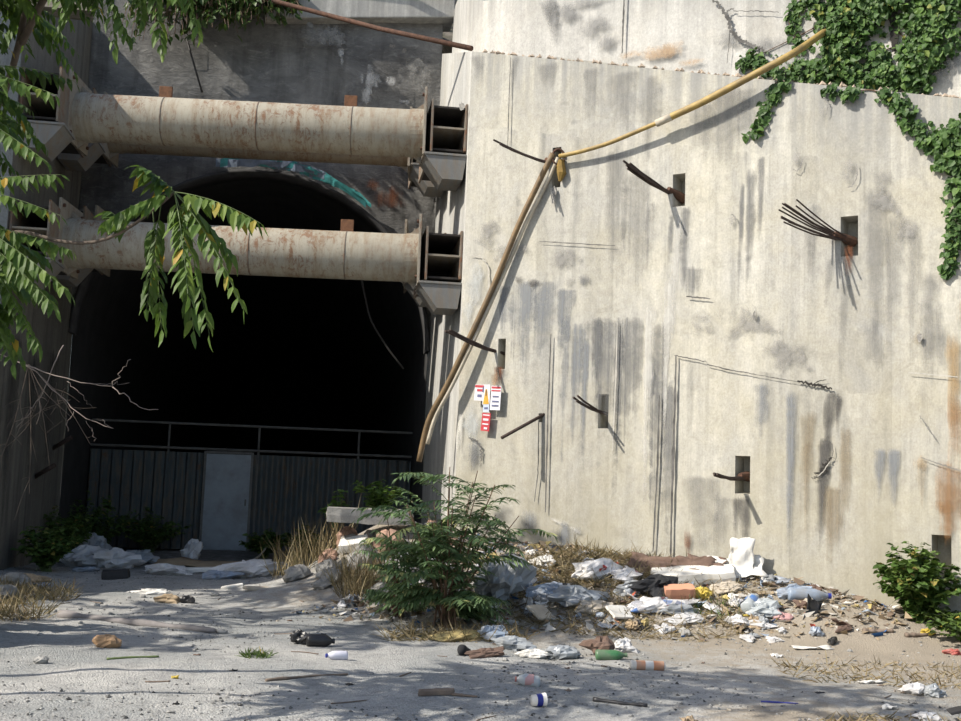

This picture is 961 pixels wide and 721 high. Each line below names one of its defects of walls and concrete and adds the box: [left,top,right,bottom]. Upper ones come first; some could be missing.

crack [712,0,779,62]
water stain [501,209,694,470]
crack [674,355,832,390]
water stain [786,396,795,519]
water stain [819,394,841,520]